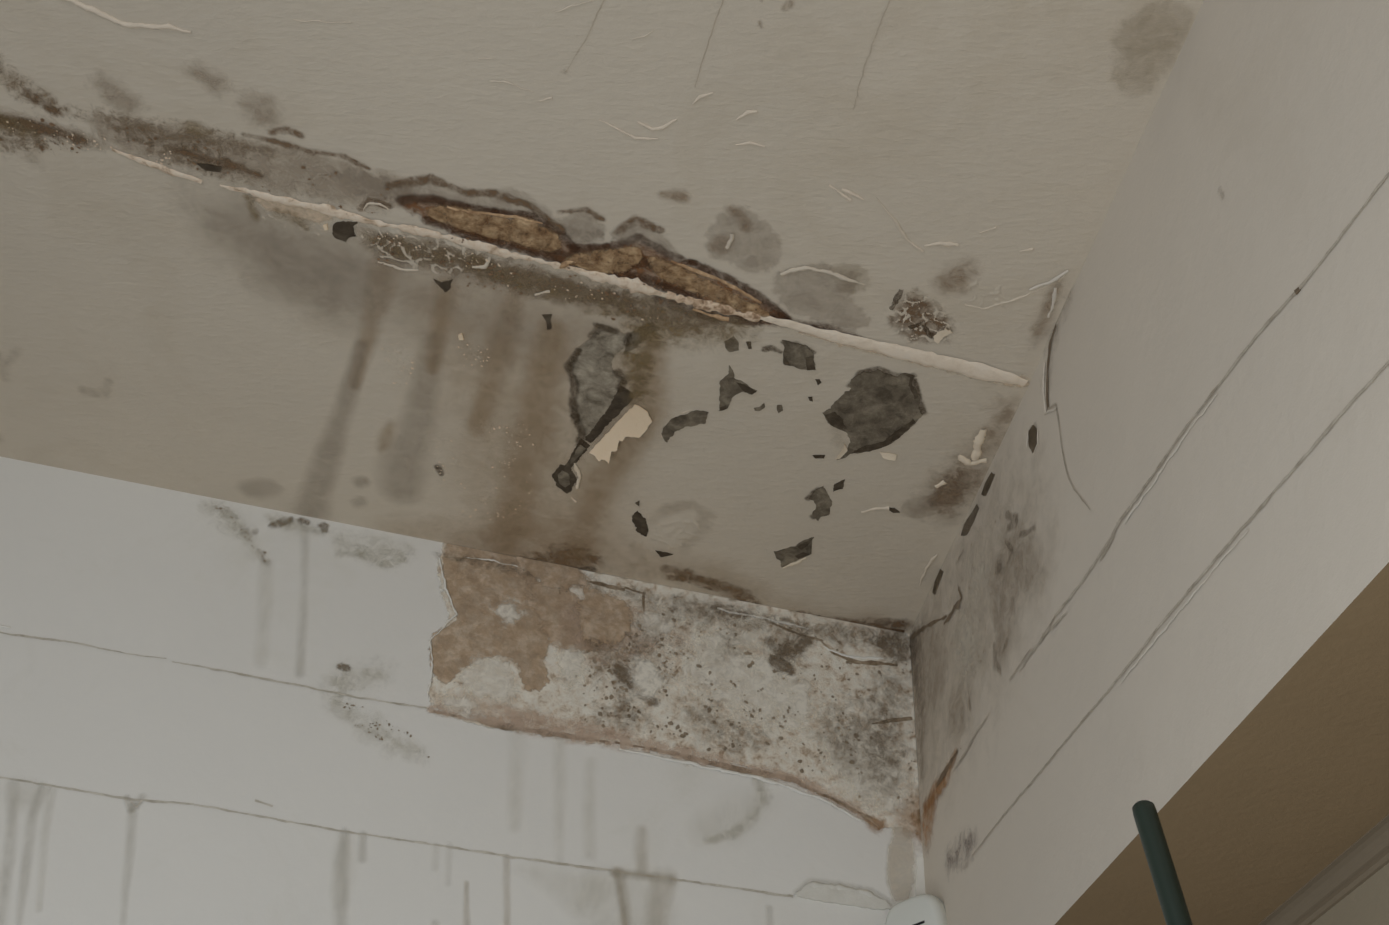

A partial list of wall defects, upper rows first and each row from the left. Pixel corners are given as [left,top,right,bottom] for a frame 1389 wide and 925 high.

water stain [0,69,662,233]
water stain [780,266,865,285]
spalling [426,206,926,503]
crack [1009,172,1389,681]
water stain [269,518,328,532]
spalling [632,501,706,557]
water stain [665,567,758,604]
spalling [774,479,845,569]
crack [717,587,962,666]
crack [972,360,1389,856]
crack [0,625,882,830]
crack [0,776,793,898]